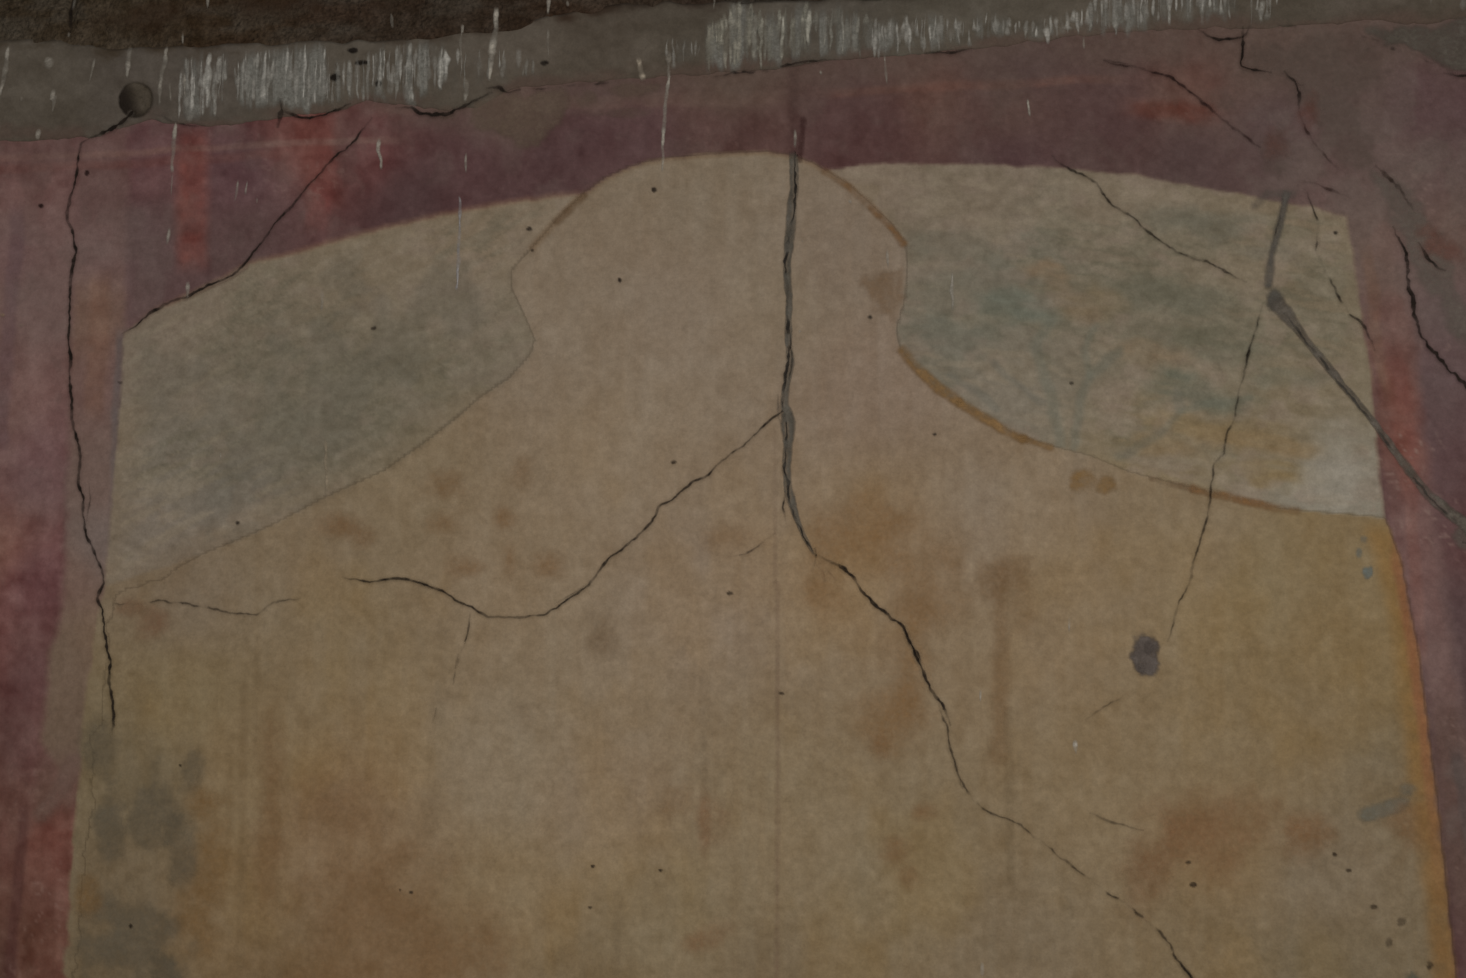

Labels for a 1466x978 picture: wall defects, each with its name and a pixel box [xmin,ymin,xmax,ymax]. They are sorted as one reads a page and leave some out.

damp [179,49,325,109]
damp [343,46,467,99]
damp [706,4,936,65]
damp [1035,0,1118,41]
damp [1140,0,1223,21]
crack [1210,36,1309,134]
crack [135,108,361,327]
crack [1067,167,1229,273]
crack [1246,188,1466,547]
crack [529,155,991,814]
crack [359,577,481,641]
crack [1109,894,1194,978]